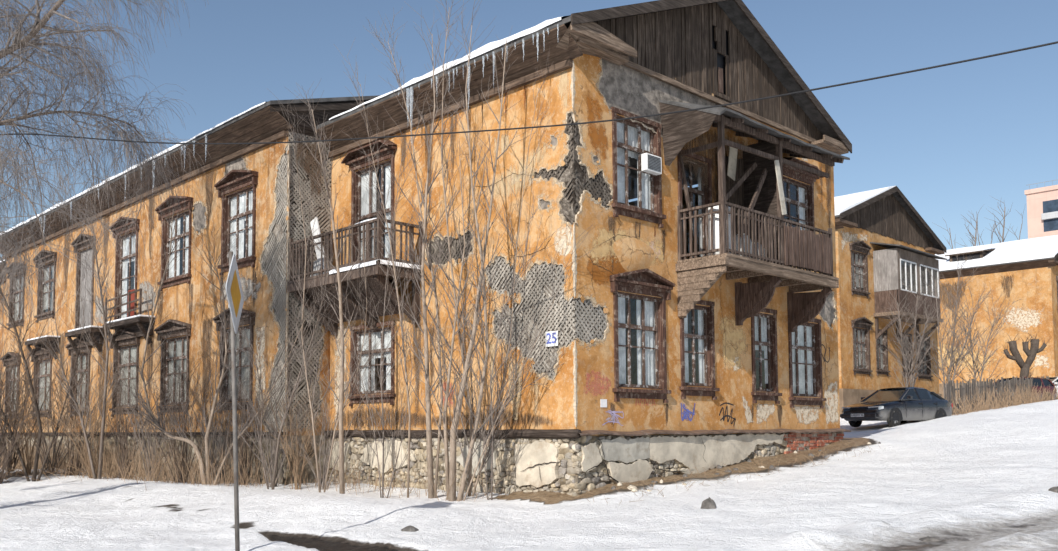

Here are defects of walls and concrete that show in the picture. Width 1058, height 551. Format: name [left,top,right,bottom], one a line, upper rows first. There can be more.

spalling [224,156,249,176]
spalling [240,131,347,436]
spalling [424,227,474,268]
spalling [484,61,613,427]